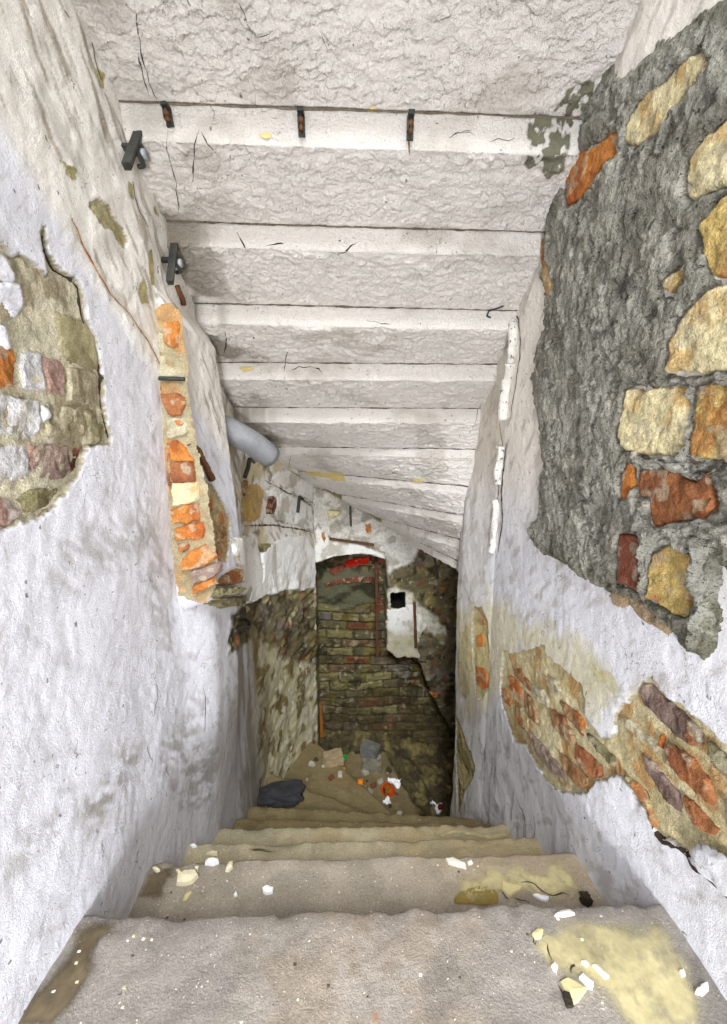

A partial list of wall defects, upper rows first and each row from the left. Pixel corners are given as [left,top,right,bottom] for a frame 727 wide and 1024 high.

crack [134,1,157,99]
crack [166,102,217,215]
flaking render [566,52,708,206]
spalling [0,236,108,528]
spalling [138,249,385,609]
flaking render [540,239,553,300]
flaking render [617,121,727,527]
flaking render [616,533,694,618]
spalling [473,608,727,898]